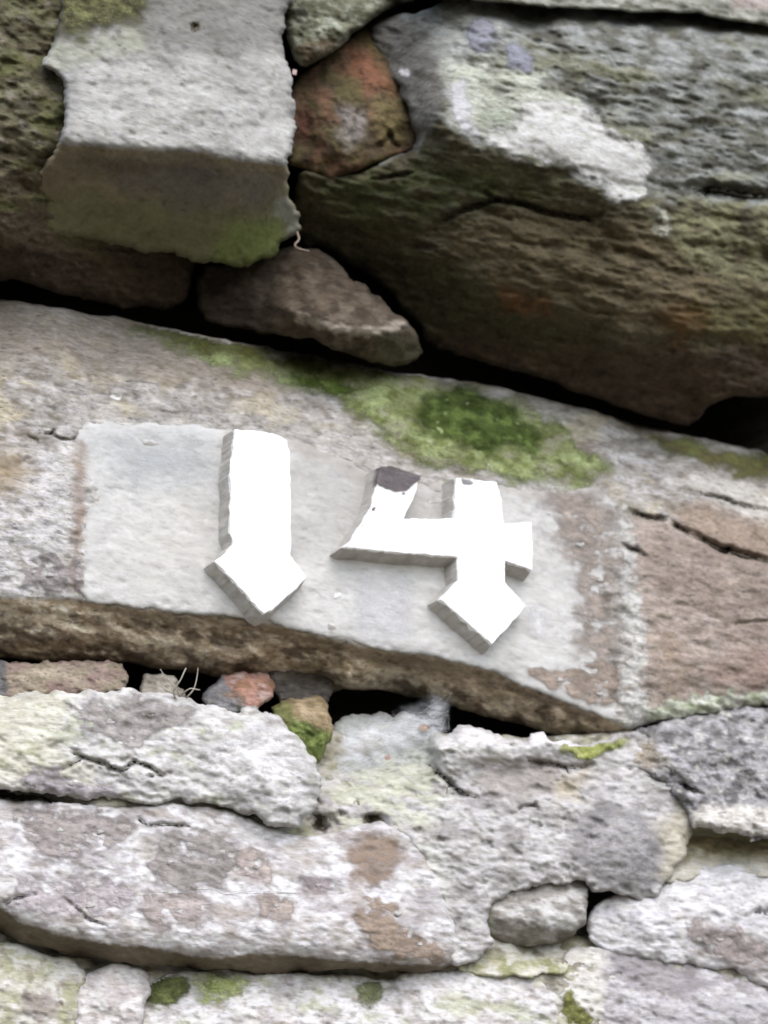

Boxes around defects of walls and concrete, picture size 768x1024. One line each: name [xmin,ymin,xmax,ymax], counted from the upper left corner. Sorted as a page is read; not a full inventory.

crack [703,494,767,512]
crack [629,511,768,563]